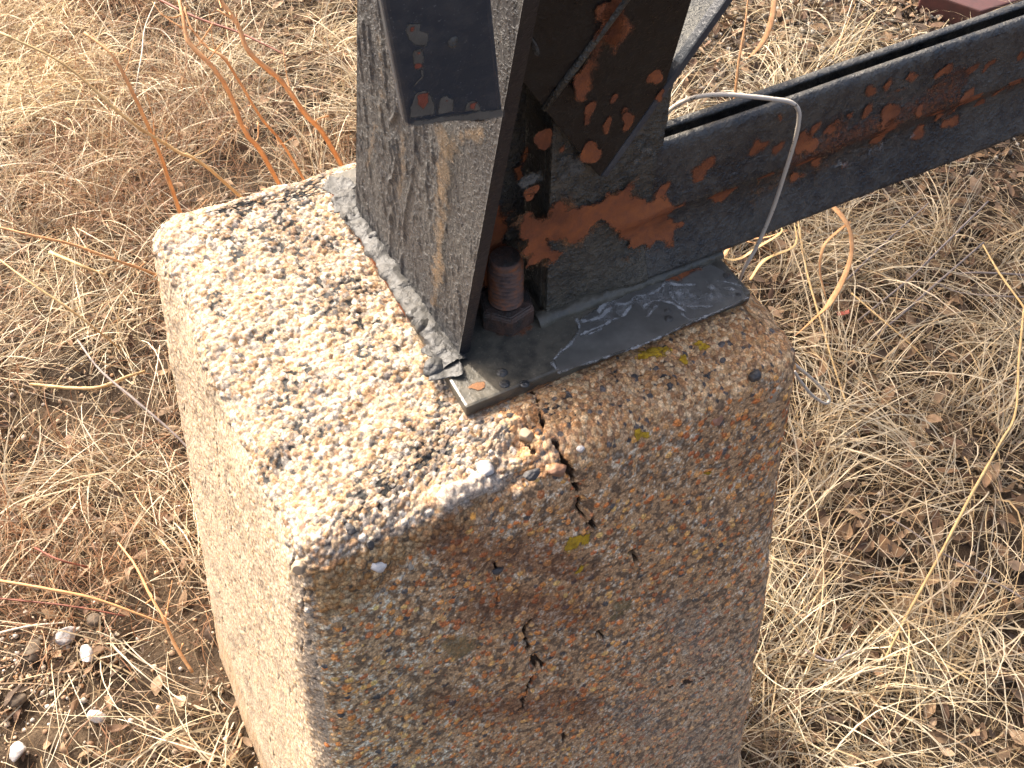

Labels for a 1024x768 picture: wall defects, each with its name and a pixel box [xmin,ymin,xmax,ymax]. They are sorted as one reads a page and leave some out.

rust [749,59,1022,182]
rust [483,128,685,289]
crack [527,392,595,528]
crack [519,619,544,709]